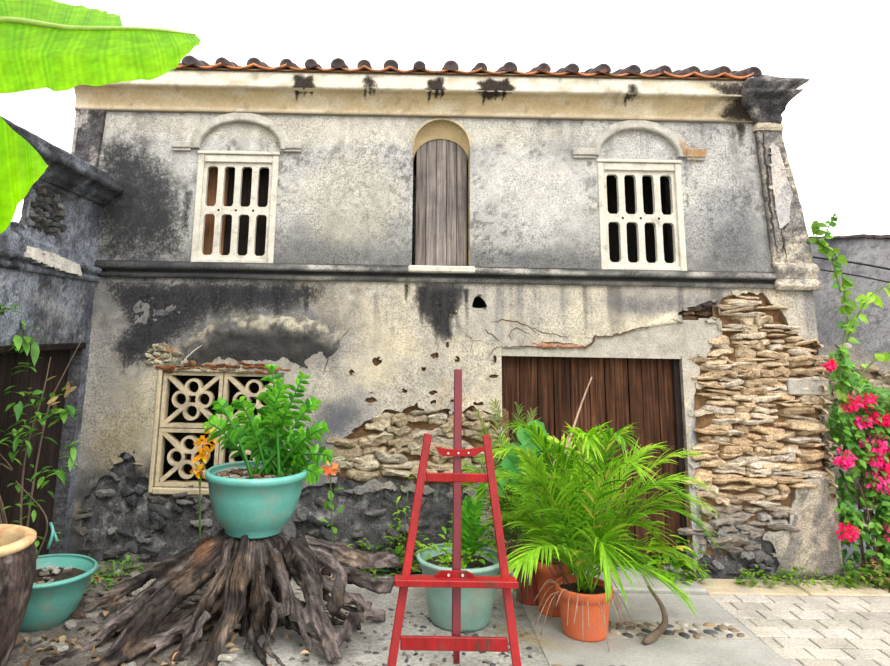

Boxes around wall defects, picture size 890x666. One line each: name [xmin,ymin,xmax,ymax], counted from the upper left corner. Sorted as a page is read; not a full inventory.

water stain [293,75,315,100]
water stain [425,77,445,100]
water stain [477,78,515,105]
spalling [11,184,68,238]
water stain [100,143,192,260]
flaking render [767,143,793,229]
water stain [107,278,323,372]
water stain [405,282,468,340]
crack [463,319,663,356]
flaking render [671,290,854,580]
spalling [75,450,224,563]
flaking render [292,390,509,574]